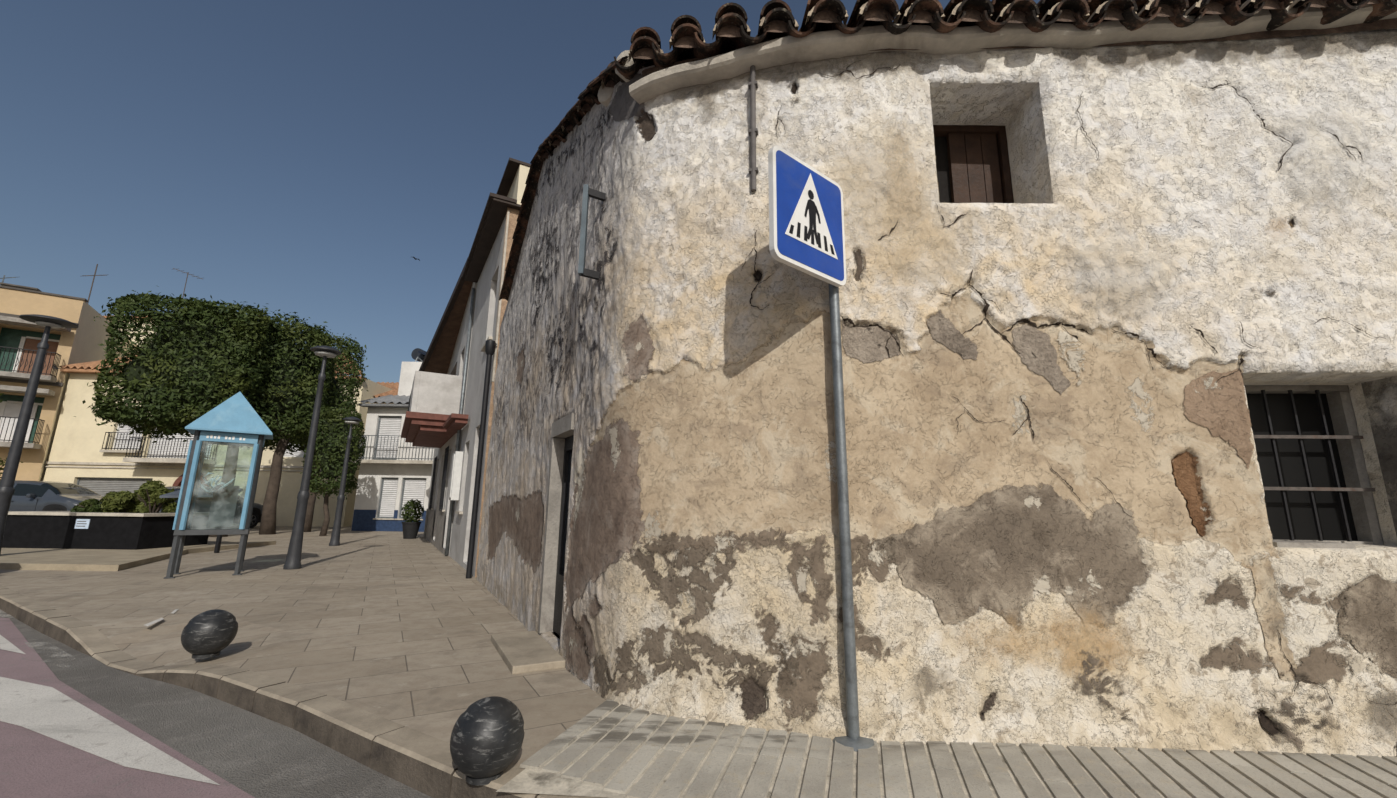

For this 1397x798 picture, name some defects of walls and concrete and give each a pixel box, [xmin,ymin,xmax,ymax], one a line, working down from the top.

spalling [635,108,656,142]
crack [1197,80,1363,171]
damp [530,197,619,401]
peeling [487,489,544,574]
peeling [562,279,1397,731]